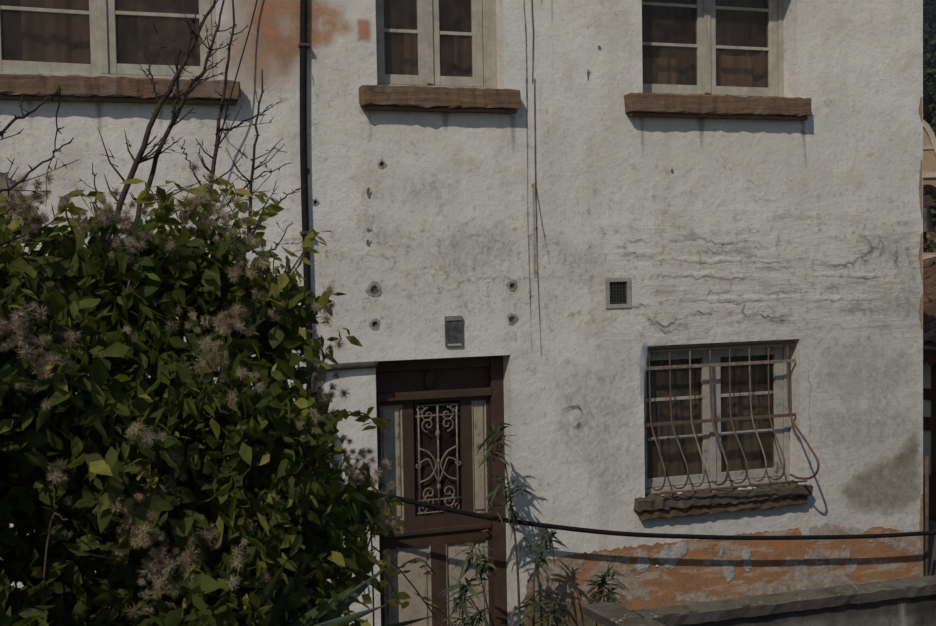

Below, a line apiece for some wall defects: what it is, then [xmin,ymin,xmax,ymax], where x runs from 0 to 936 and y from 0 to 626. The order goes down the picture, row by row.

rust [241,0,347,63]
rust [359,21,369,39]
flaking render [0,172,30,241]
peeling [529,540,689,610]
peeling [674,494,923,602]